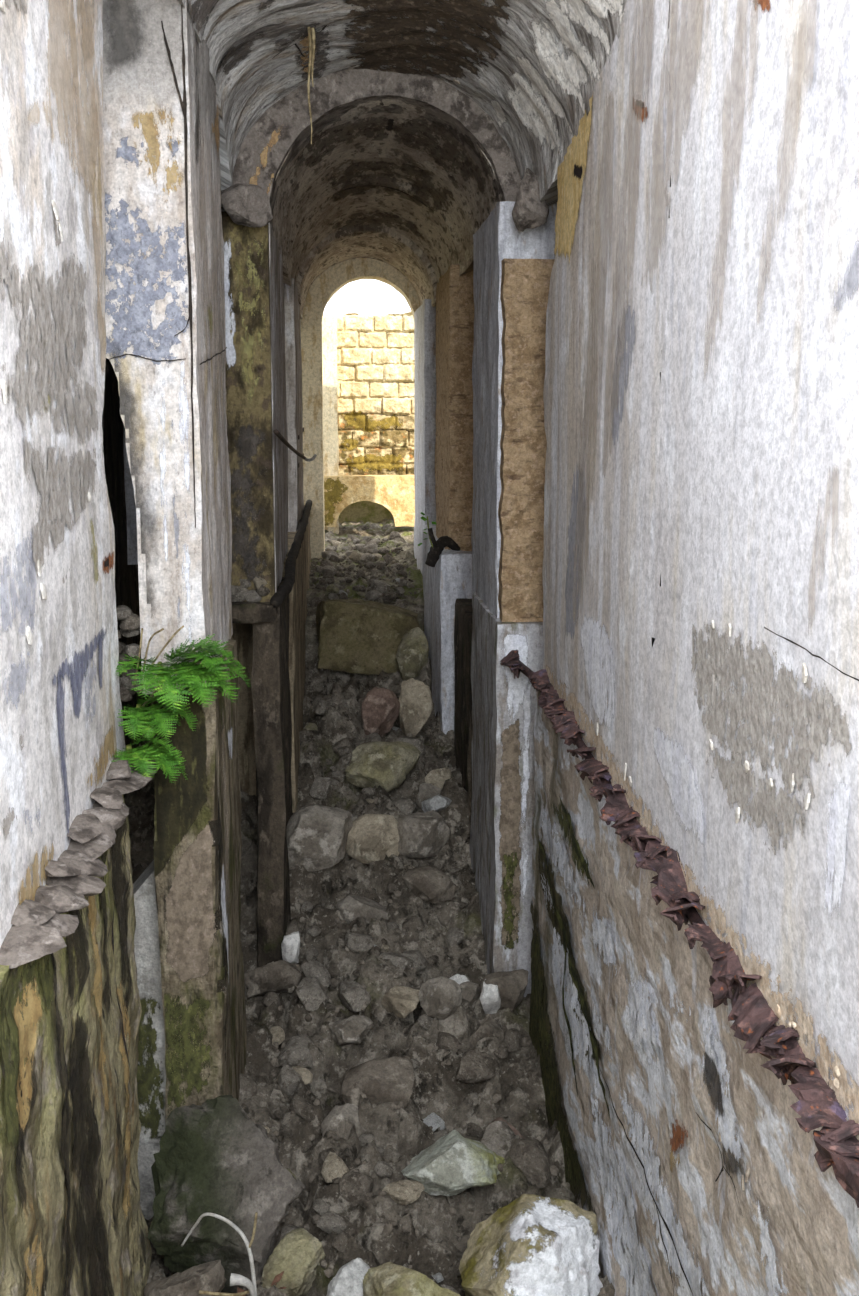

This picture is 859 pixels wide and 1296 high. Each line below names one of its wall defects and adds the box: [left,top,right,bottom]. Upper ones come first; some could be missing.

flaking render [0,200,98,600]
leakage [231,424,266,592]
flaking render [691,620,852,855]
crack [764,627,859,681]
leakage [16,1051,38,1206]
leakage [51,819,131,1296]